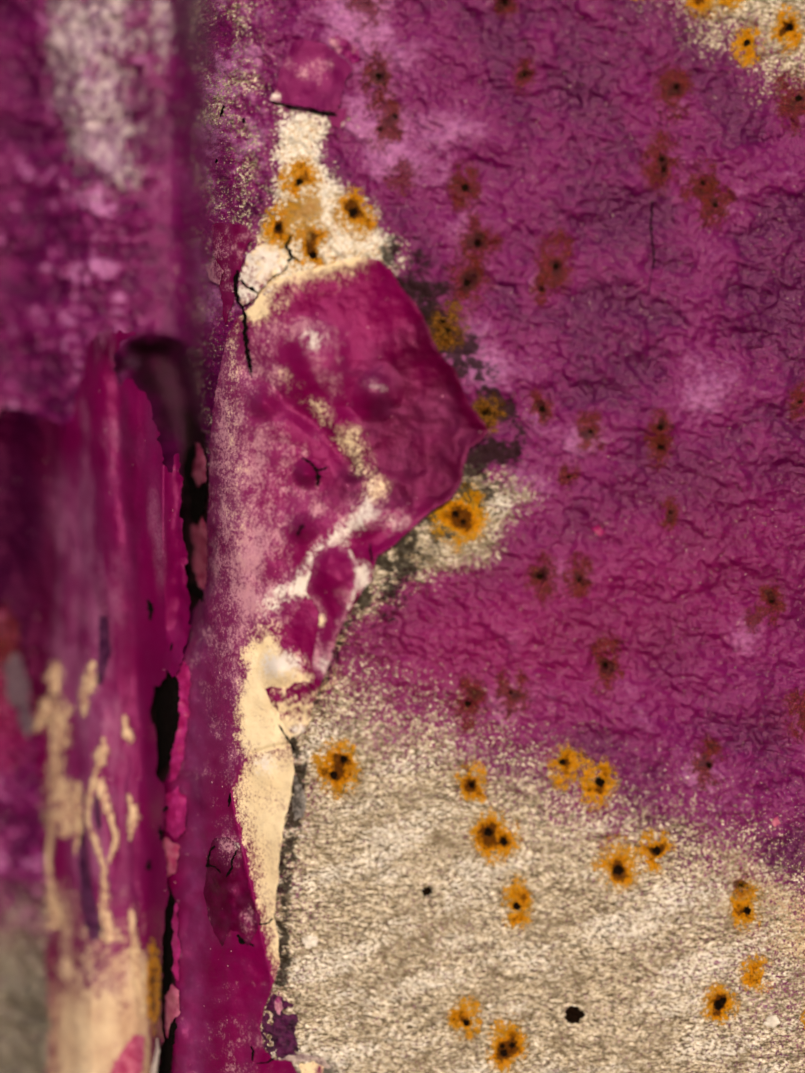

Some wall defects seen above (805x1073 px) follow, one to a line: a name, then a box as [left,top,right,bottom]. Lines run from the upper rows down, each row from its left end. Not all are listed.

rust [730,3,805,68]
rust [260,156,378,270]
crack [233,270,258,373]
peeling [0,222,489,1073]
rust [311,737,364,801]
rust [454,760,523,867]
crack [206,845,237,878]
rust [591,827,676,894]
crack [236,918,273,947]
rust [446,995,530,1073]
rust [565,1006,585,1024]
rust [699,953,773,1026]